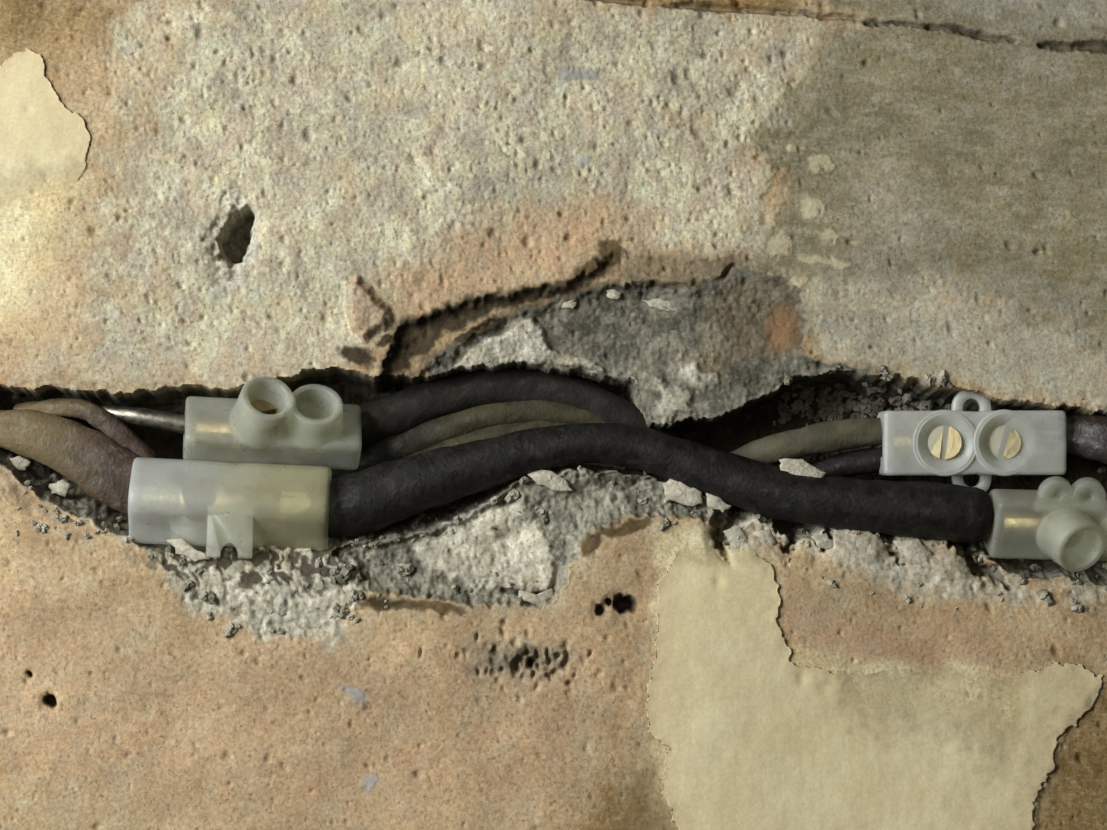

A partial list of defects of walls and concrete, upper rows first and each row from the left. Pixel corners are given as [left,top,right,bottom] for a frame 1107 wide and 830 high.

crack [587,0,1107,54]
peeling [0,48,91,200]
peeling [751,162,774,199]
peeling [808,154,835,174]
peeling [800,197,825,219]
spalling [0,229,1107,452]
spalling [123,422,294,465]
peeling [0,445,1107,830]